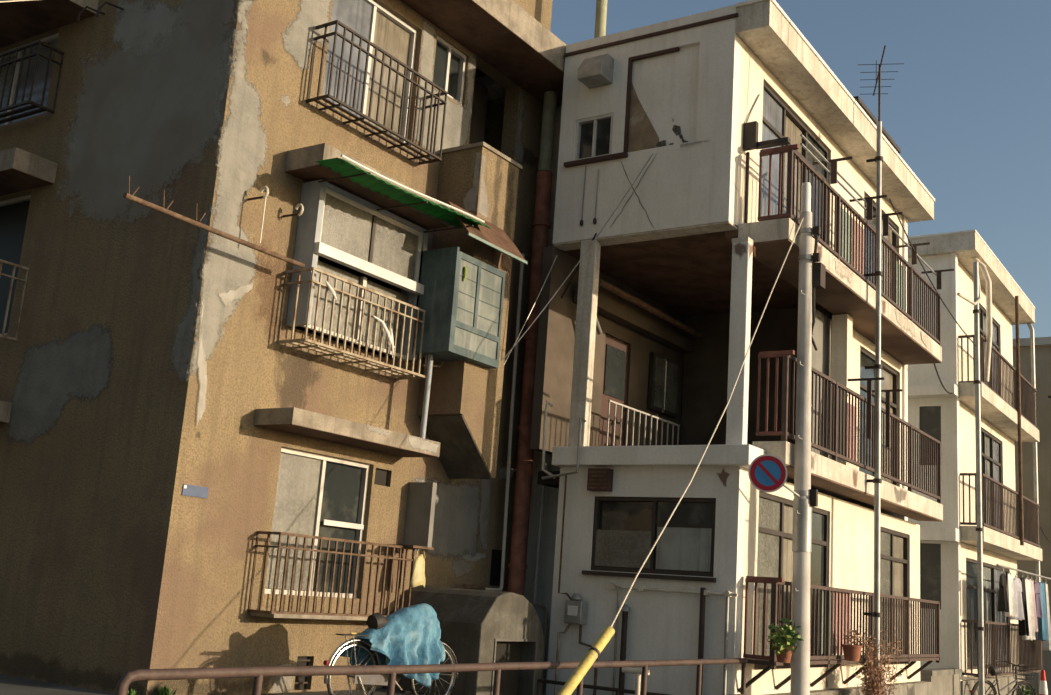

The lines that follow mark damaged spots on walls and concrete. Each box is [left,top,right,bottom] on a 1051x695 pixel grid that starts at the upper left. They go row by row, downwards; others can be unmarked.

peeling [57,0,239,221]
leakage [463,152,488,217]
peeling [219,283,253,306]